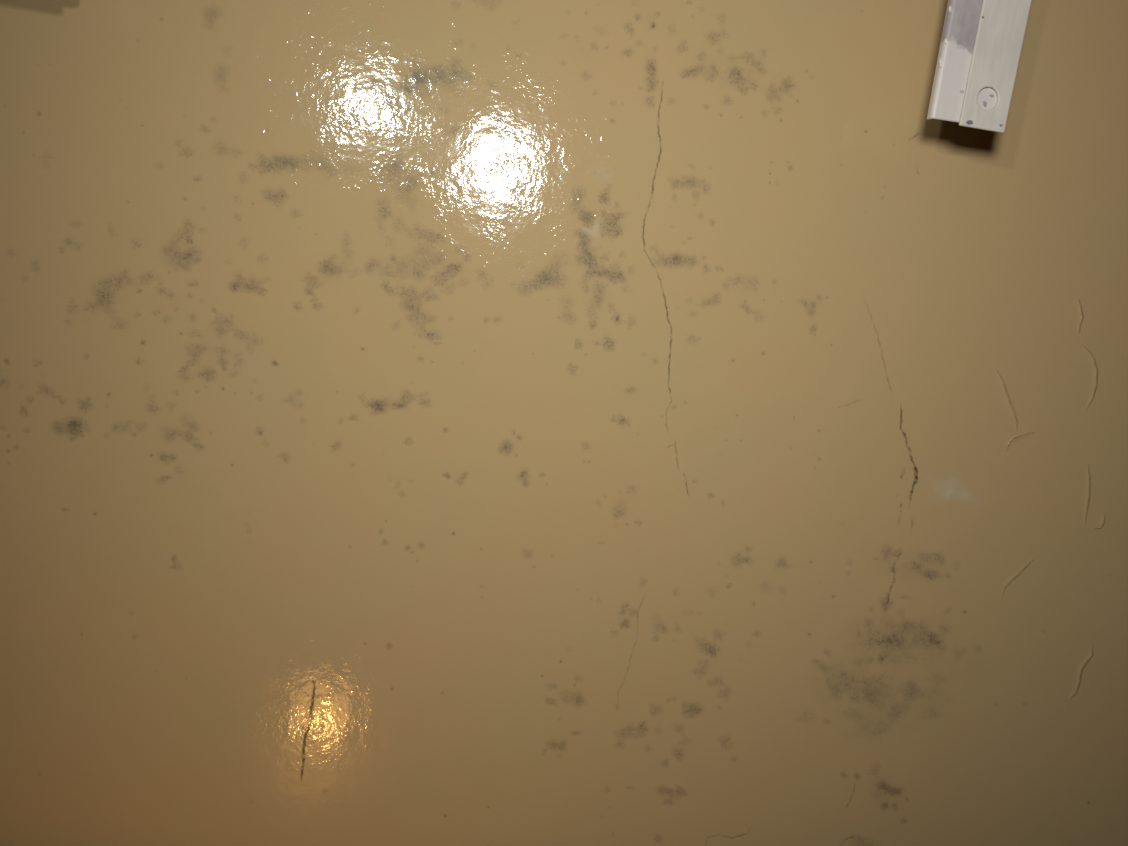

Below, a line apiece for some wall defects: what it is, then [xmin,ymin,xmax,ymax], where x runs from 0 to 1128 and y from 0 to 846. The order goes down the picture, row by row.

crack [302,688,315,774]